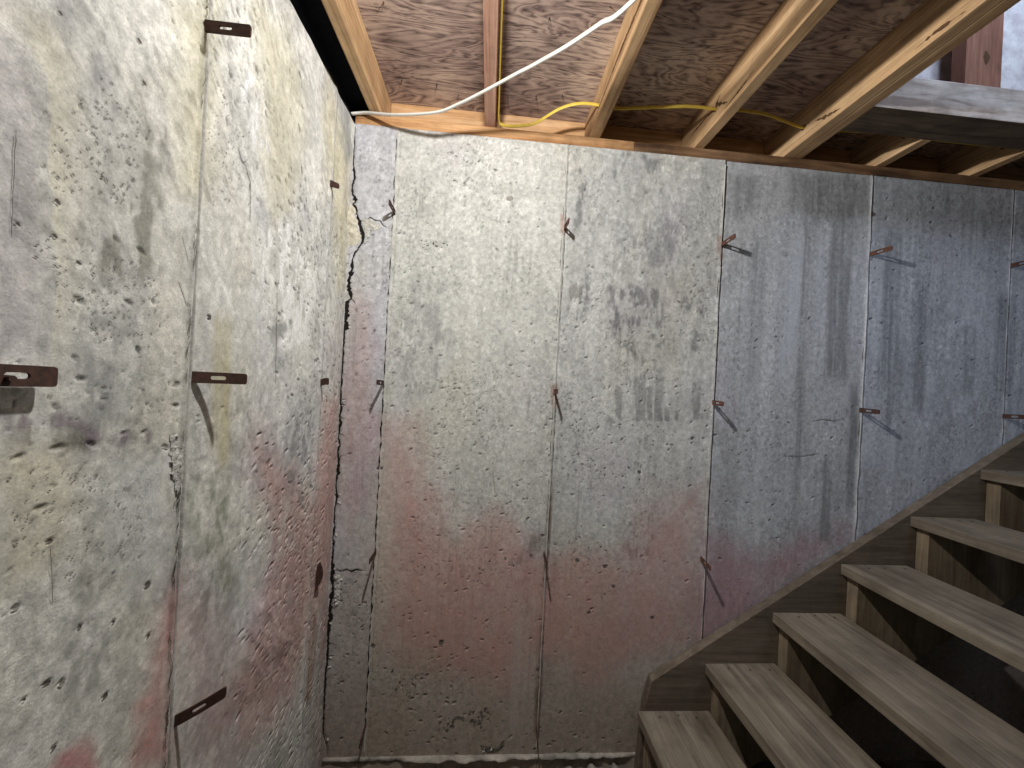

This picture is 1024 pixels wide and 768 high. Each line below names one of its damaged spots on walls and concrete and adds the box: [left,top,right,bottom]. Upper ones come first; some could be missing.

crack [322,127,386,752]
damp [610,289,658,325]